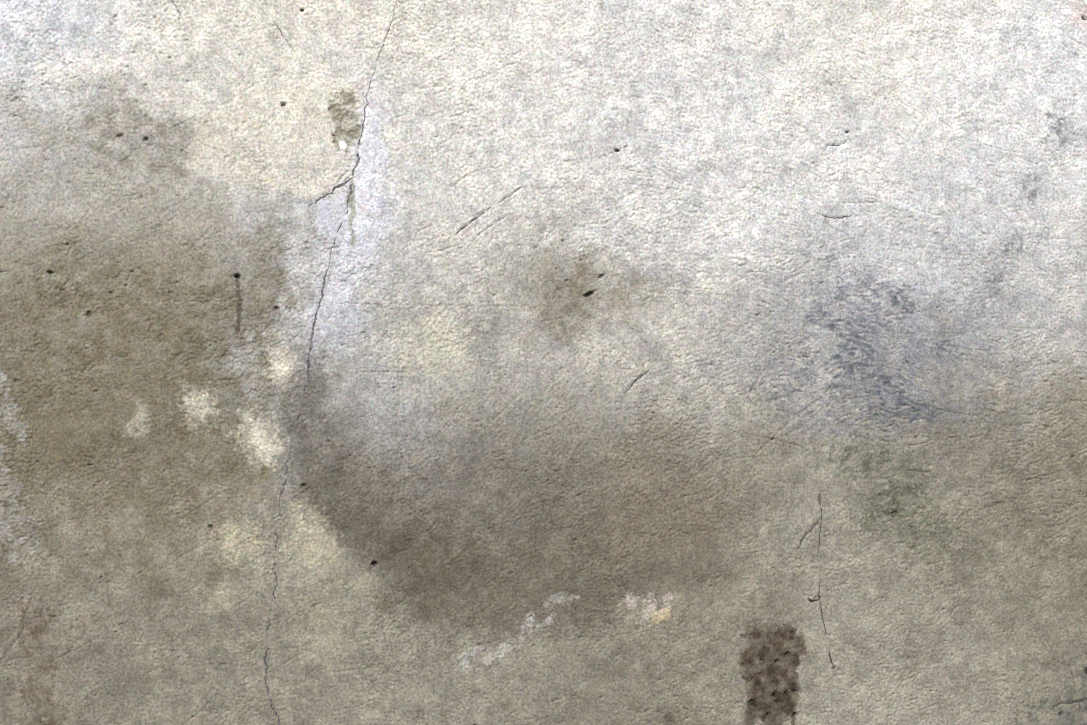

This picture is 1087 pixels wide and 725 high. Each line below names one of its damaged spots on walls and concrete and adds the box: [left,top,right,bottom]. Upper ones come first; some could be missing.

crack [263,0,397,725]
leakage [0,56,813,725]
leakage [721,215,1036,467]
leakage [1004,94,1087,211]